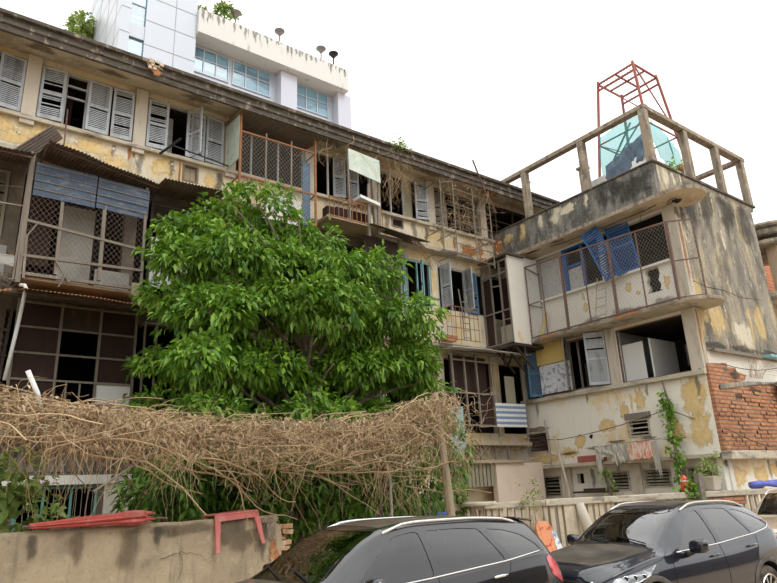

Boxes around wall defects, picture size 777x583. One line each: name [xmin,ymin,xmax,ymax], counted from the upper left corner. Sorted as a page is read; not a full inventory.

spalling [147,58,164,76]
leakage [656,164,681,186]
leakage [538,177,648,227]
leakage [680,193,750,249]
rust [453,237,483,257]
peeling [699,305,767,350]
leakage [706,342,776,355]
peeling [529,389,646,464]
peeling [668,377,713,447]